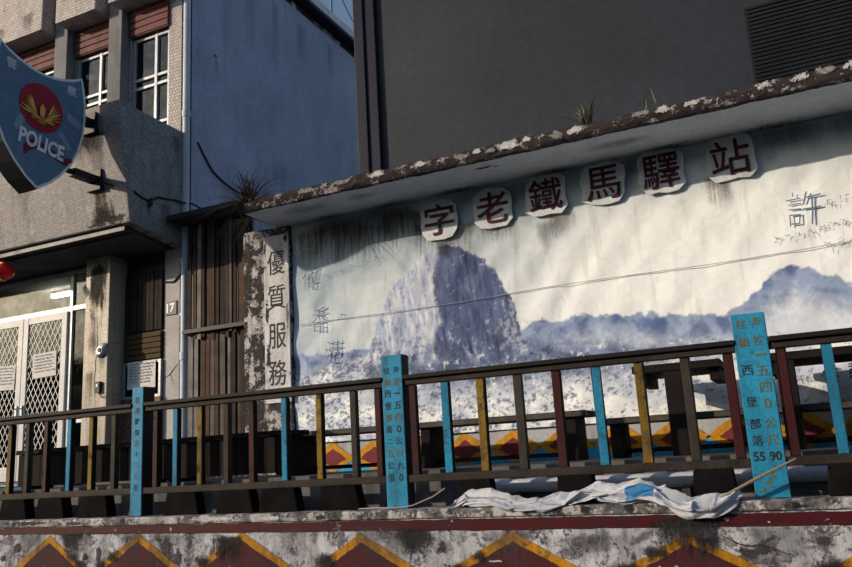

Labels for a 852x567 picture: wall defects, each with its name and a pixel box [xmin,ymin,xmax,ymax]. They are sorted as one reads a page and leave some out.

leakage [79,133,102,157]
leakage [88,264,106,320]
peeling [245,240,270,389]
peeling [82,538,101,561]
peeling [156,527,181,565]
spalling [721,536,793,564]
spalling [816,531,840,546]